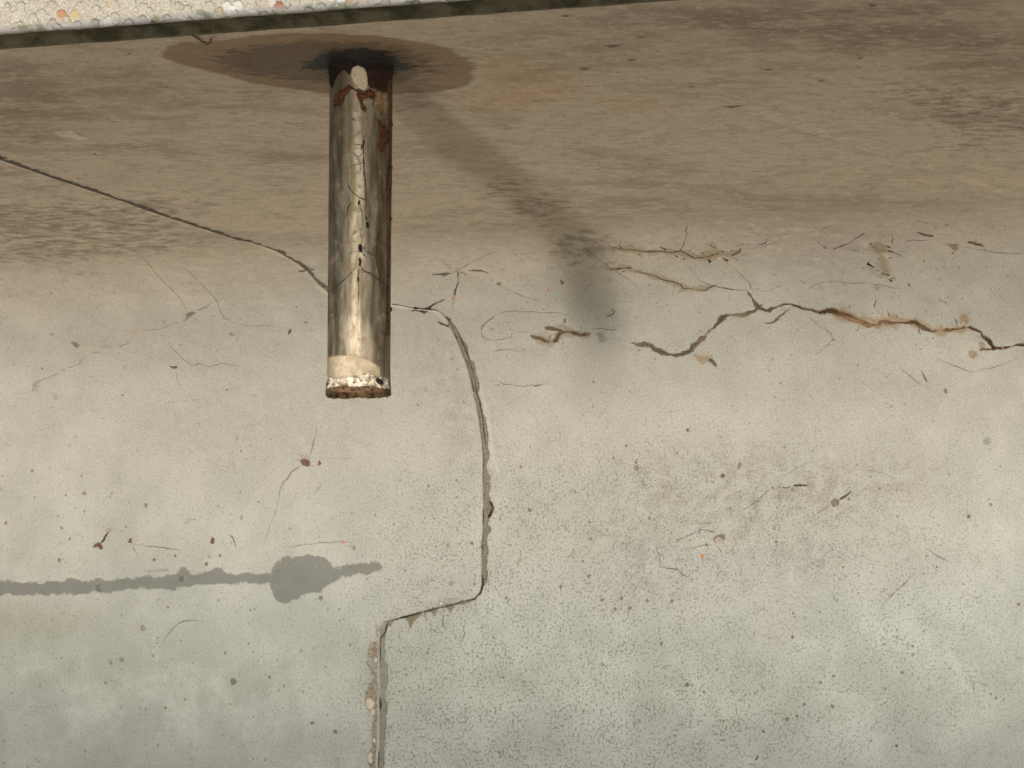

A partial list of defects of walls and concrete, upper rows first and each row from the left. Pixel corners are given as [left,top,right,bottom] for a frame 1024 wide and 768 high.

leakage [148,30,490,96]
rust [333,68,394,335]
crack [606,225,1024,383]
leakage [0,550,385,608]
spalling [362,619,382,768]